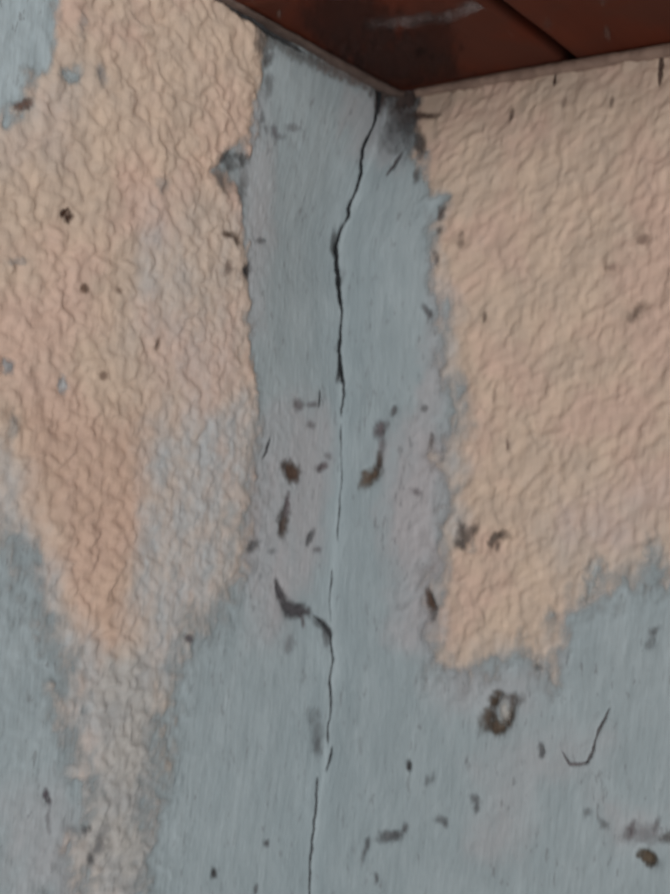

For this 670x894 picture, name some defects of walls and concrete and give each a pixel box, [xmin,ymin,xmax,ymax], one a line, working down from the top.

peeling [0,0,58,128]
crack [331,90,382,540]
rust [360,452,382,485]
peeling [136,35,670,894]
peeling [0,535,97,894]
crack [309,573,334,894]
crack [562,709,609,766]